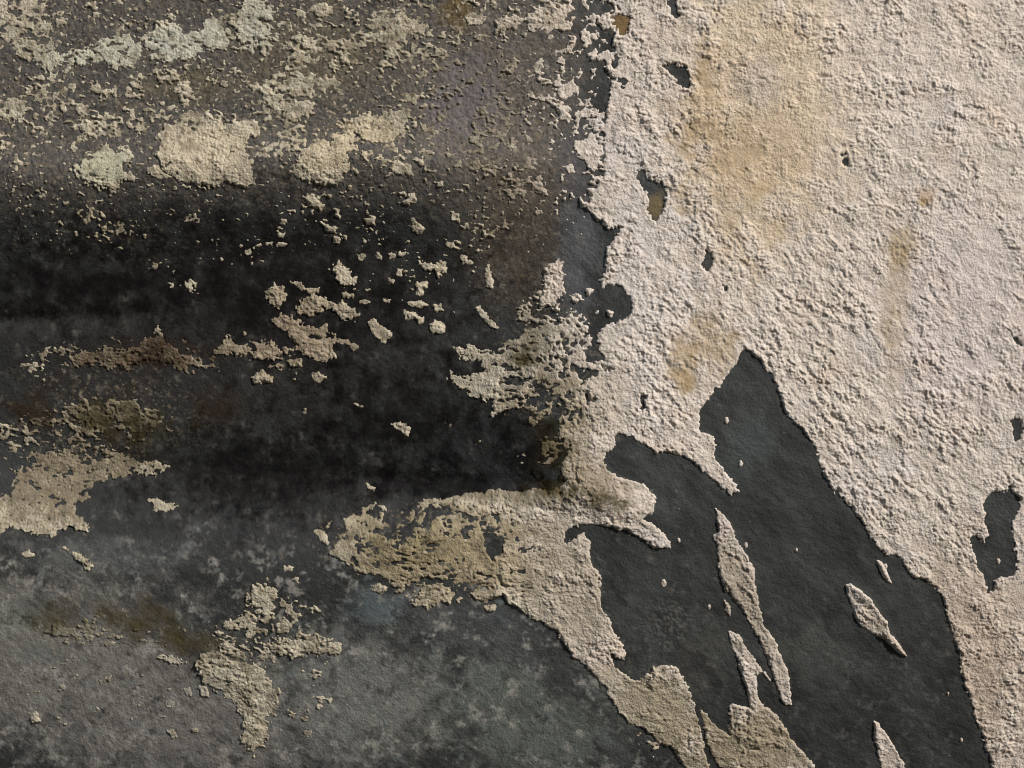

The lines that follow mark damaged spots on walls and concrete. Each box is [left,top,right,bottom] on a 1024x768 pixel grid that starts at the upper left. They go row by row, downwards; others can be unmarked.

peeling [662,63,692,88]
leakage [0,254,151,320]
leakage [166,209,422,348]
peeling [0,0,685,768]
leakage [316,379,560,471]
leakage [189,441,352,520]
leakage [373,474,490,500]
flaking render [564,349,992,768]
flaking render [970,485,1020,593]